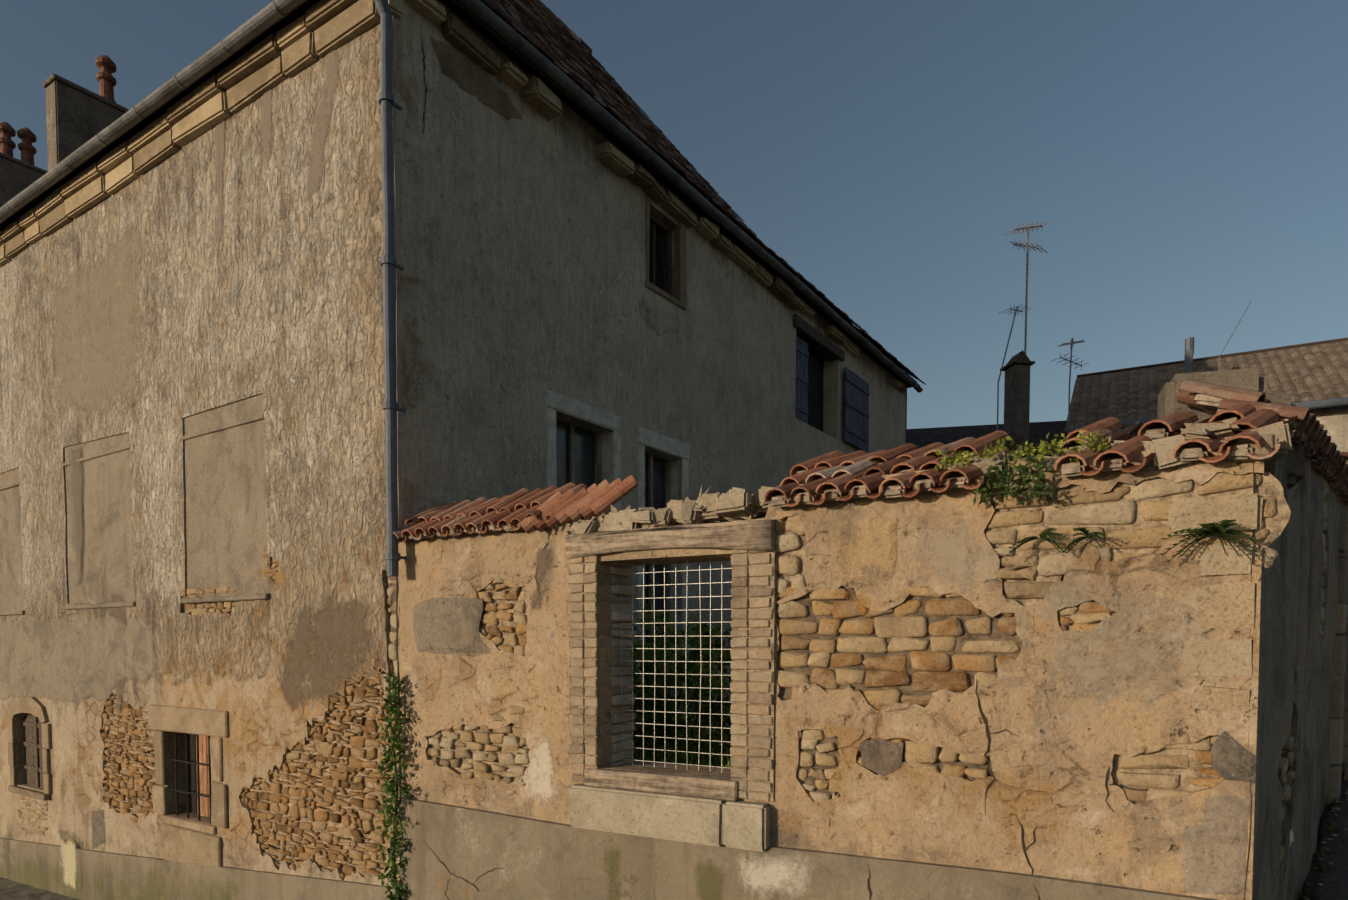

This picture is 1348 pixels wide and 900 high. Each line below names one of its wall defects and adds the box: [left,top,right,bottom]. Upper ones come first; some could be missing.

leakage [282,601,371,709]
flaking render [478,579,527,656]
flaking render [774,472,1291,711]
flaking render [100,695,156,823]
flaking render [241,571,400,886]
flaking render [427,705,530,796]
flaking render [797,729,841,802]
flaking render [857,737,994,790]
crack [975,679,1040,900]
flaking render [1111,735,1225,803]
leakage [744,863,794,888]